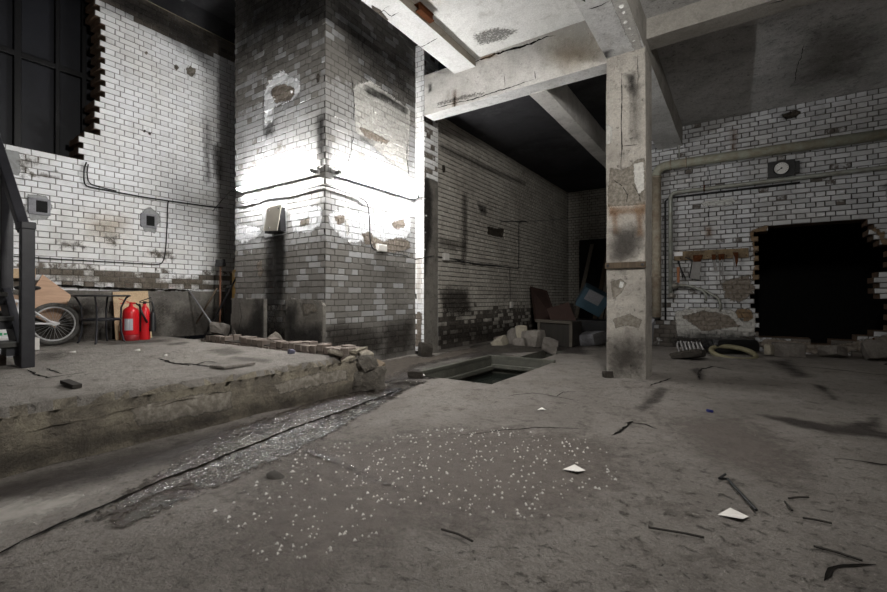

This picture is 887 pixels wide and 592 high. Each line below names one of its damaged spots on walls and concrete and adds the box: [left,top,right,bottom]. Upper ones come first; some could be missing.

crack [475,35,554,62]
peeling [263,70,301,136]
crack [438,76,536,108]
spalling [611,279,626,299]
peeling [675,225,887,354]
spalling [613,314,642,328]
crack [158,358,212,367]
crack [693,366,730,380]